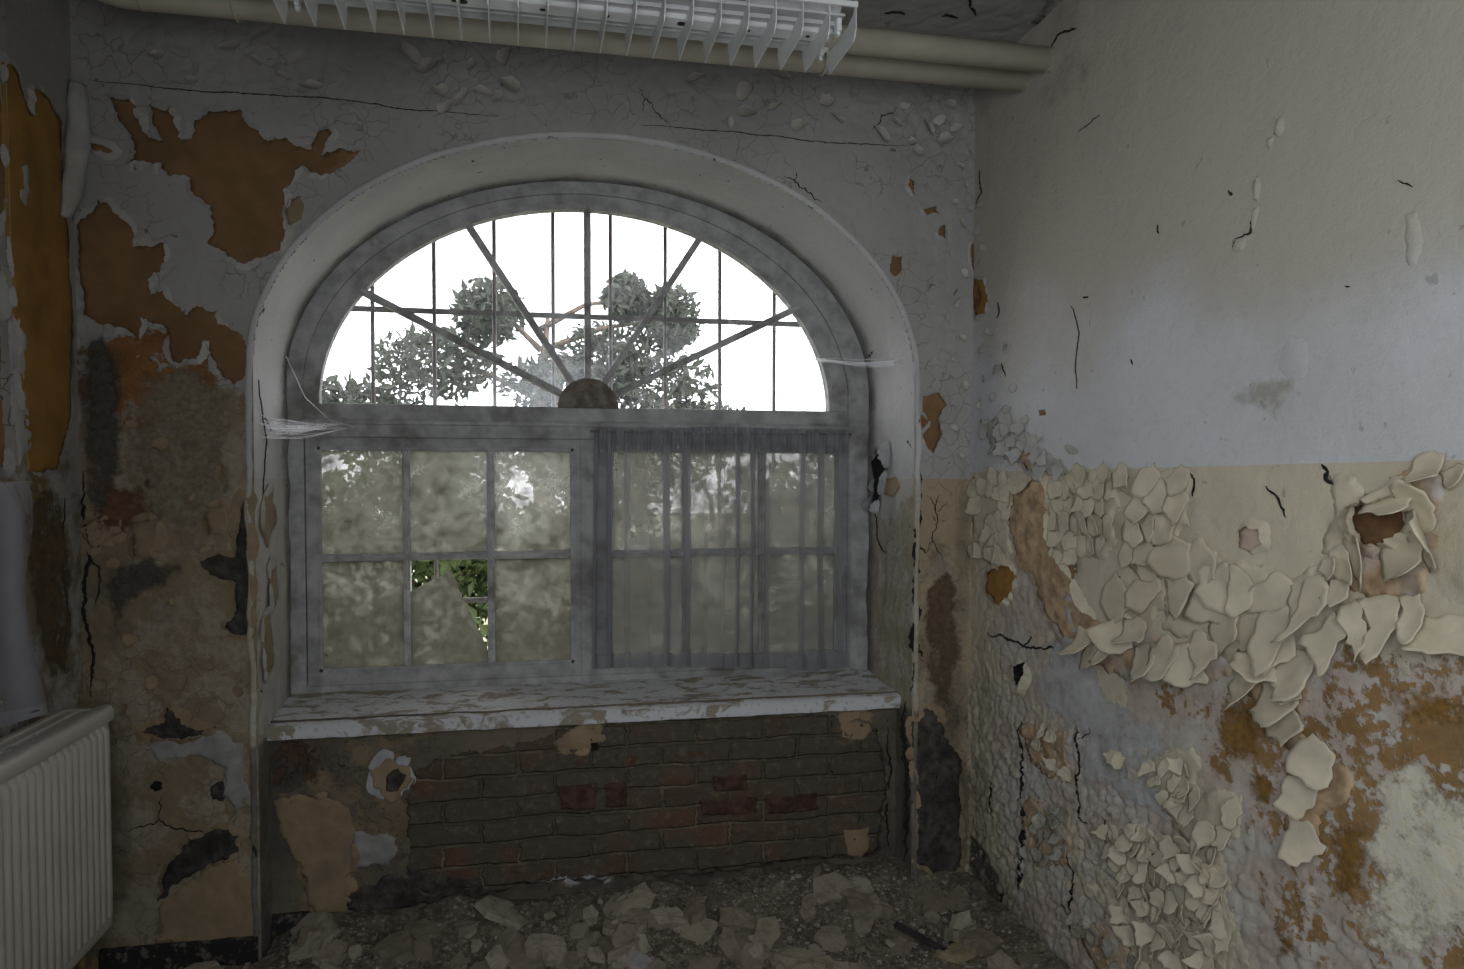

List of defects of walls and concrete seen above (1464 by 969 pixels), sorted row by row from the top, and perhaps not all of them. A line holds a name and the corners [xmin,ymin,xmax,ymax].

peeling [0,50,360,477]
spalling [79,513,128,557]
spalling [200,482,279,683]
peeling [965,200,1464,868]
spalling [134,705,260,943]
spalling [273,710,892,913]
spalling [905,704,967,875]
peeling [1064,740,1251,969]